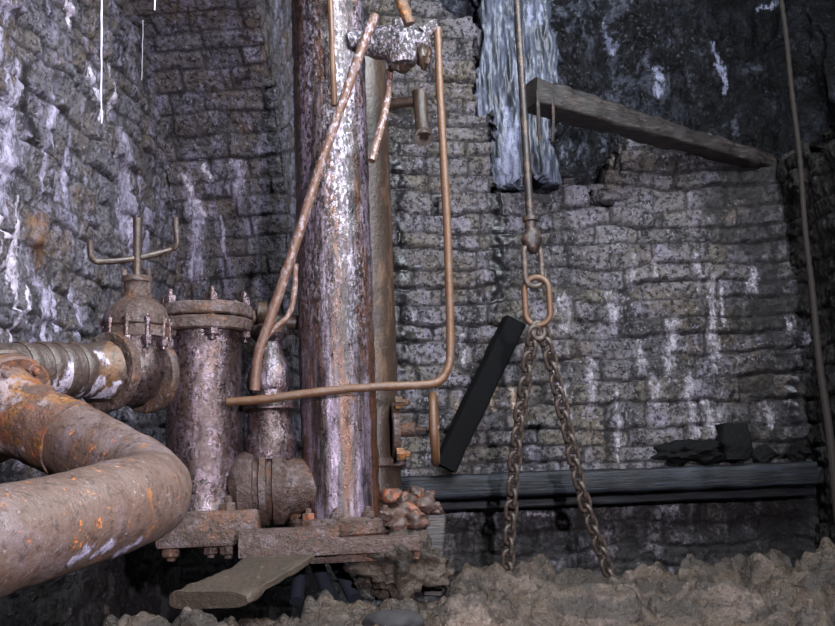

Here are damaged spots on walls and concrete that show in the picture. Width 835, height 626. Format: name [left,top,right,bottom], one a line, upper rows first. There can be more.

water stain [63,0,75,29]
water stain [87,62,117,122]
water stain [0,0,62,342]
water stain [60,147,69,208]
water stain [113,129,154,269]
water stain [178,172,208,285]
water stain [229,158,247,210]
water stain [67,287,84,343]
water stain [605,291,619,327]
water stain [693,253,726,371]
water stain [662,318,721,439]
water stain [614,391,622,463]